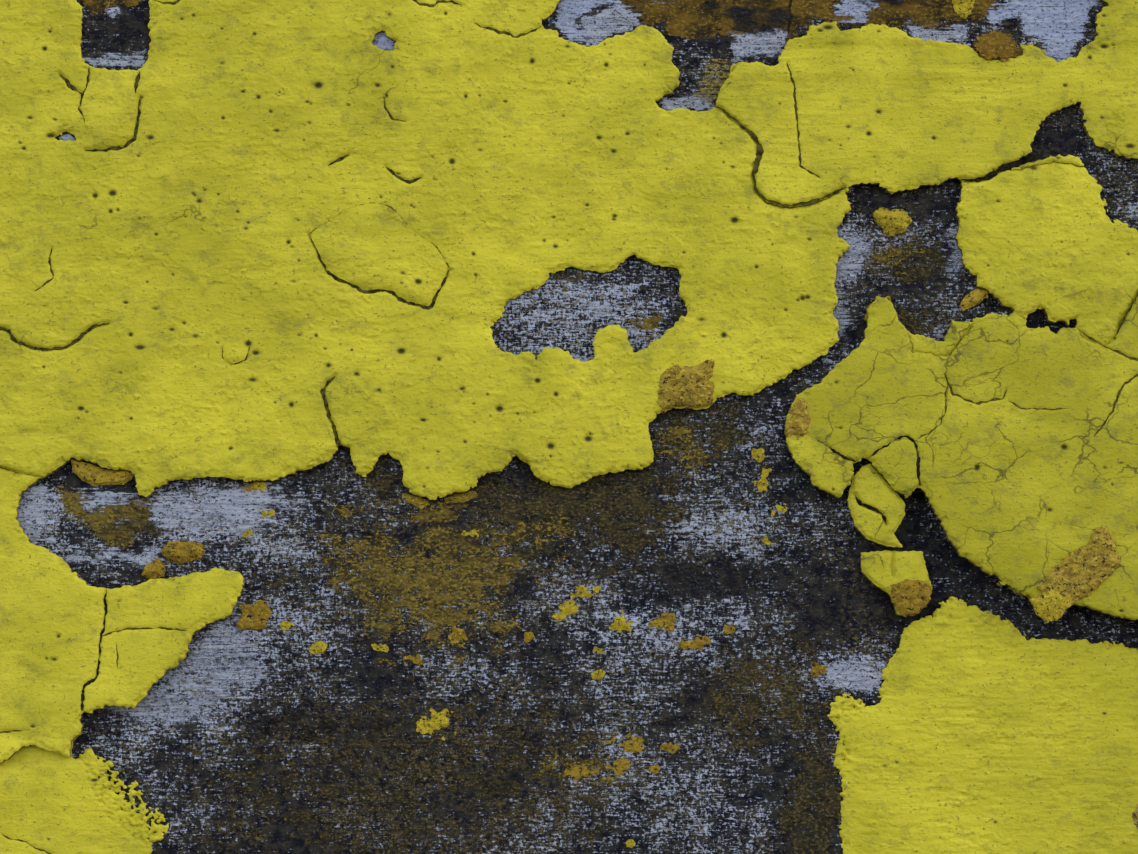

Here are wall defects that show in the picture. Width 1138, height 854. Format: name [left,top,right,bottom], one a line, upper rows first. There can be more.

peeling [76,0,151,71]
peeling [542,0,1138,424]
crack [961,156,1039,182]
crack [0,323,109,351]
peeling [491,256,688,362]
crack [1081,292,1138,437]
crack [818,375,1138,649]
crack [81,587,186,711]
peeling [0,373,933,854]